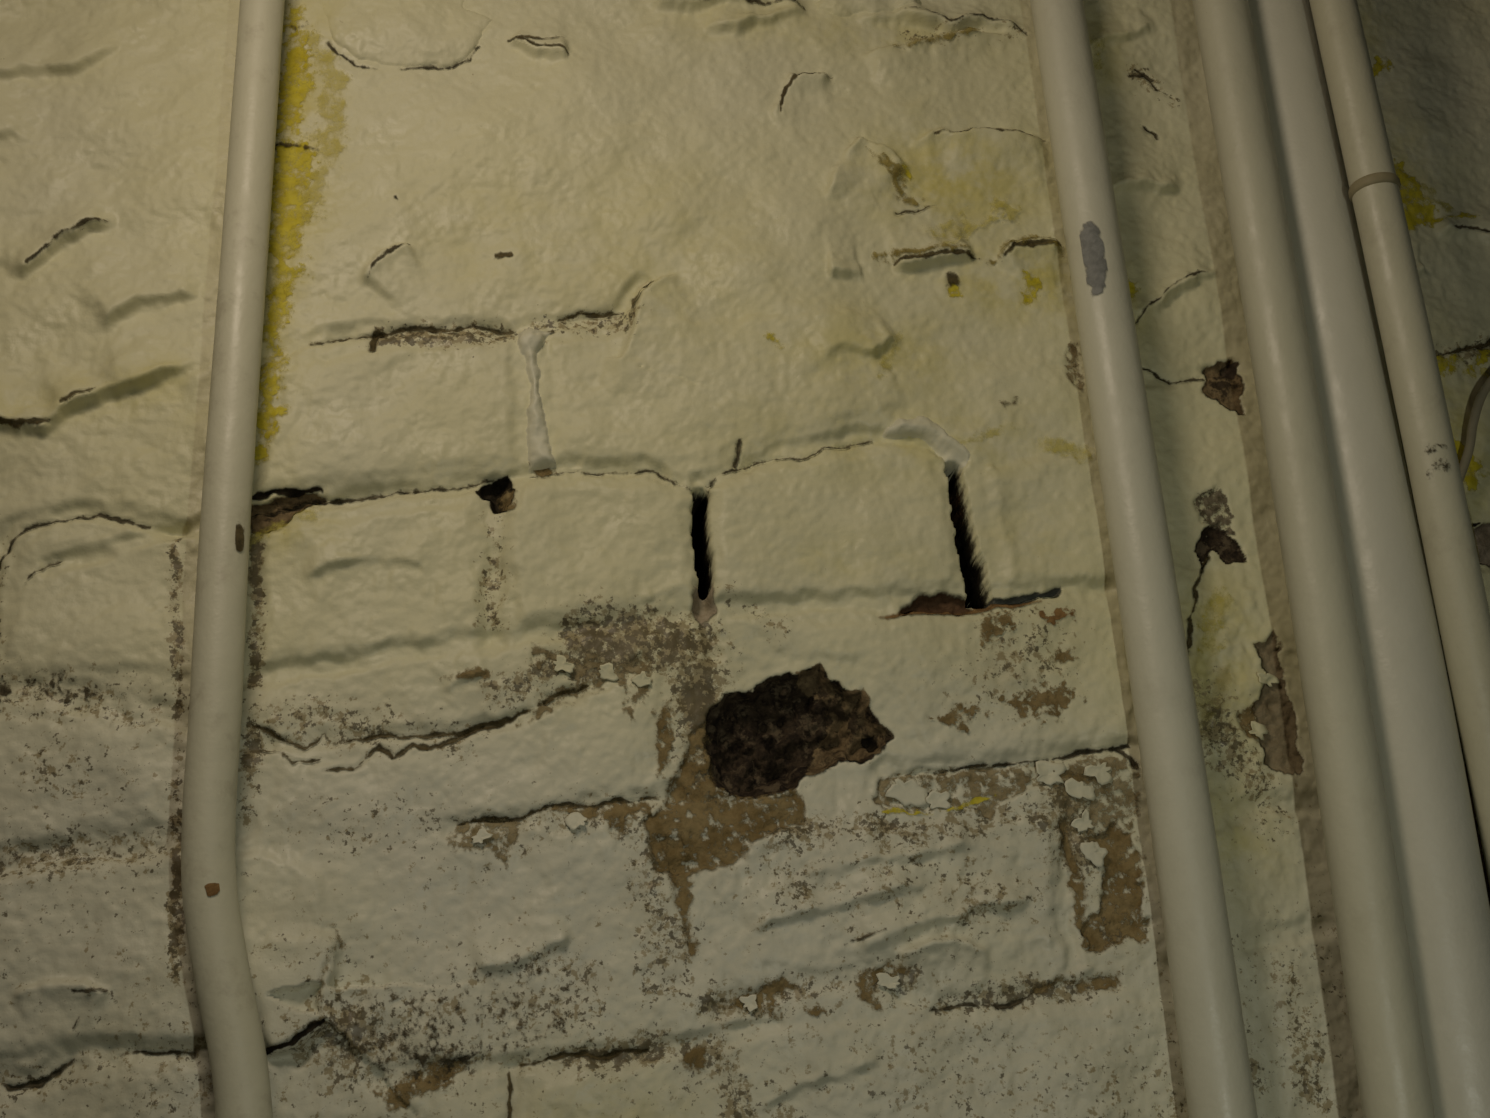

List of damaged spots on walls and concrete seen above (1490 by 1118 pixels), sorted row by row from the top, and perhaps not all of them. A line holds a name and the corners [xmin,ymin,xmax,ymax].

damp [255,4,349,465]
damp [1394,159,1476,230]
spalling [1187,489,1247,652]
crack [252,685,589,772]
peeling [439,666,493,680]
spalling [1238,630,1304,774]
peeling [448,816,524,869]
spalling [515,647,894,956]
spalling [873,754,1150,953]